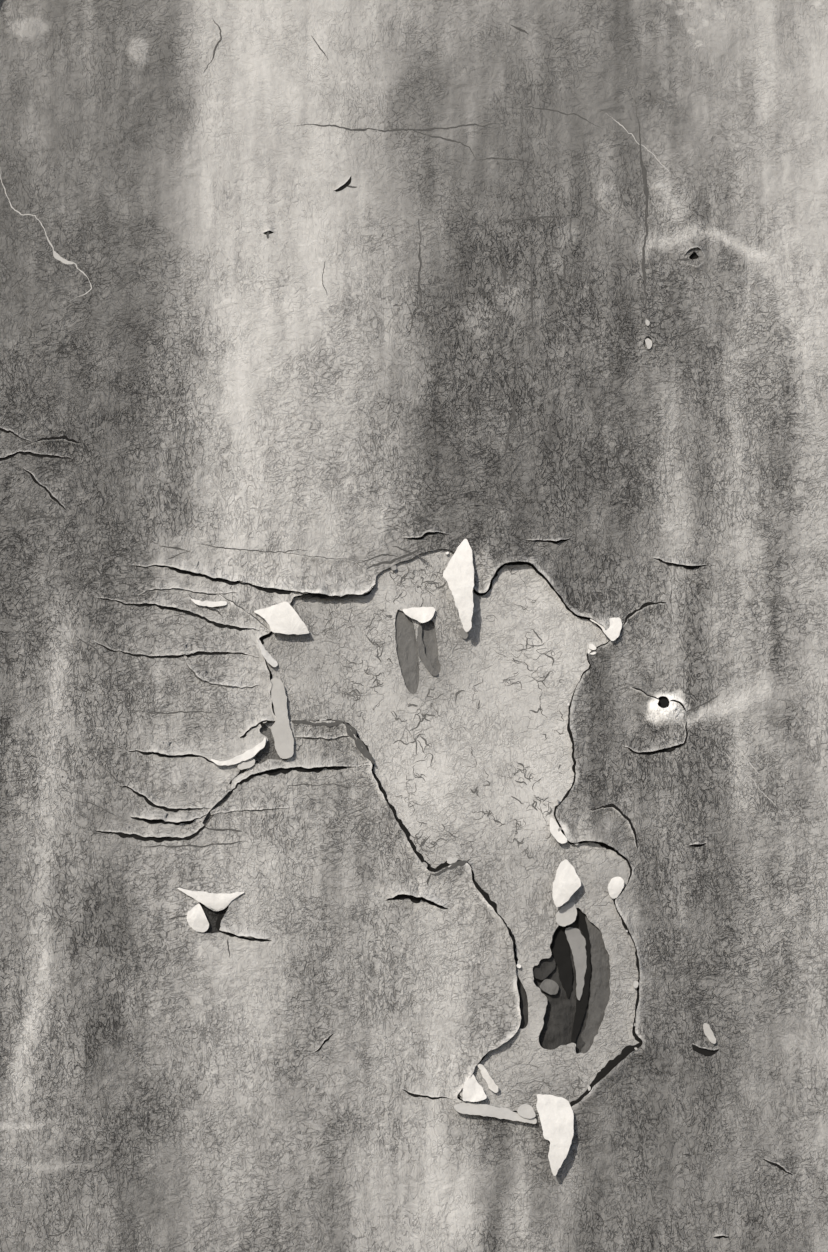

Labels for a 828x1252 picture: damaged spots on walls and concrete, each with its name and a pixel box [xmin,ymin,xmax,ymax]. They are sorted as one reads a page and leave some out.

crack [262,222,274,239]
crack [333,175,356,192]
crack [410,218,434,331]
crack [0,396,82,527]
peeling [191,599,227,607]
damp [377,0,828,1252]
crack [53,523,452,848]
peeling [177,888,244,932]
peeling [211,539,643,1183]